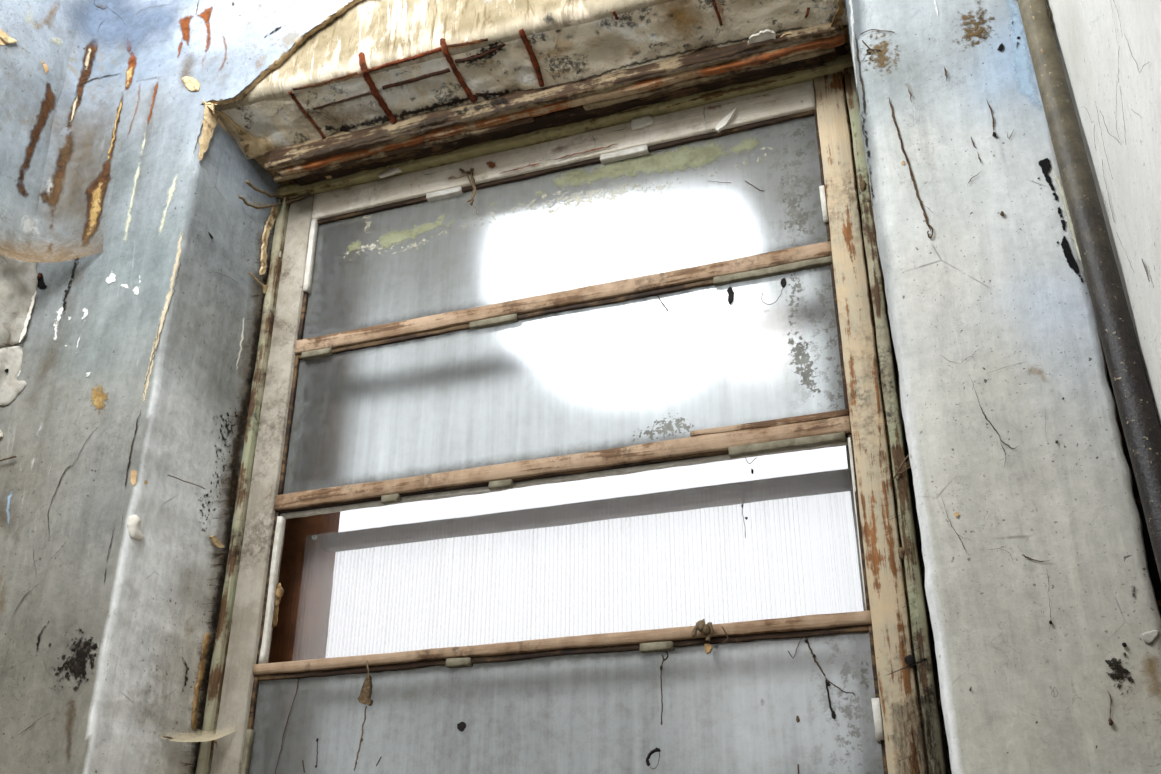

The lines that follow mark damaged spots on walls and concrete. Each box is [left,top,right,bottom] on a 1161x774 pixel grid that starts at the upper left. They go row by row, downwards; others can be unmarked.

peeling [0,29,18,45]
rust [17,39,98,227]
rust [82,42,158,245]
rust [178,1,212,56]
rust [303,68,375,88]
rust [320,89,522,132]
rust [395,40,504,67]
spalling [181,0,874,204]
crack [889,98,933,238]
rust [63,258,79,314]
damp [51,629,98,690]